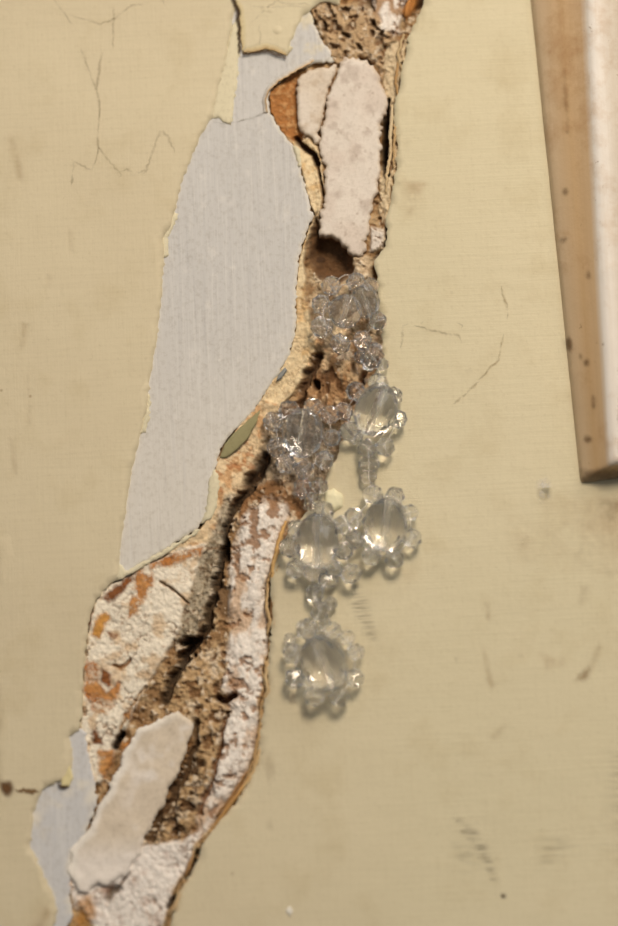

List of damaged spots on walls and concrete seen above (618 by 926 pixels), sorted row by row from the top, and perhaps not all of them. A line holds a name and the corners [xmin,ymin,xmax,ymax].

crack [16,783,68,794]
peeling [30,10,336,926]
crack [83,0,424,926]
flaking render [324,488,343,512]